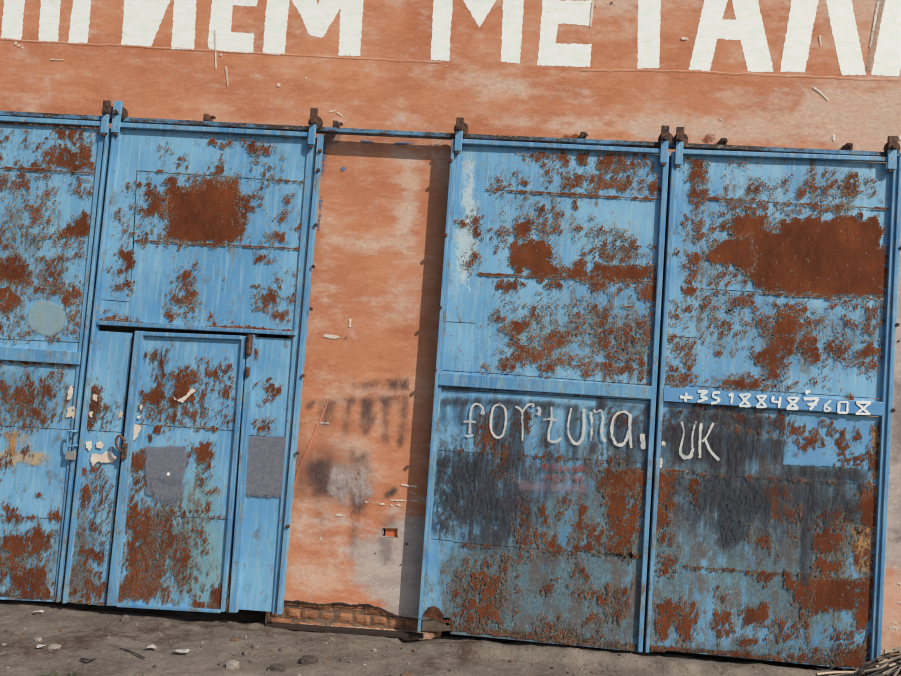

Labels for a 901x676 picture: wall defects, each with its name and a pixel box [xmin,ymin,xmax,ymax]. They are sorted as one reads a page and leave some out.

rust [0,122,101,345]
rust [99,130,304,368]
rust [454,147,662,386]
rust [665,156,889,400]
rust [0,500,62,600]
rust [0,360,76,482]
peeling [86,441,117,466]
rust [67,345,284,612]
spalling [268,600,439,635]
rust [441,397,880,669]